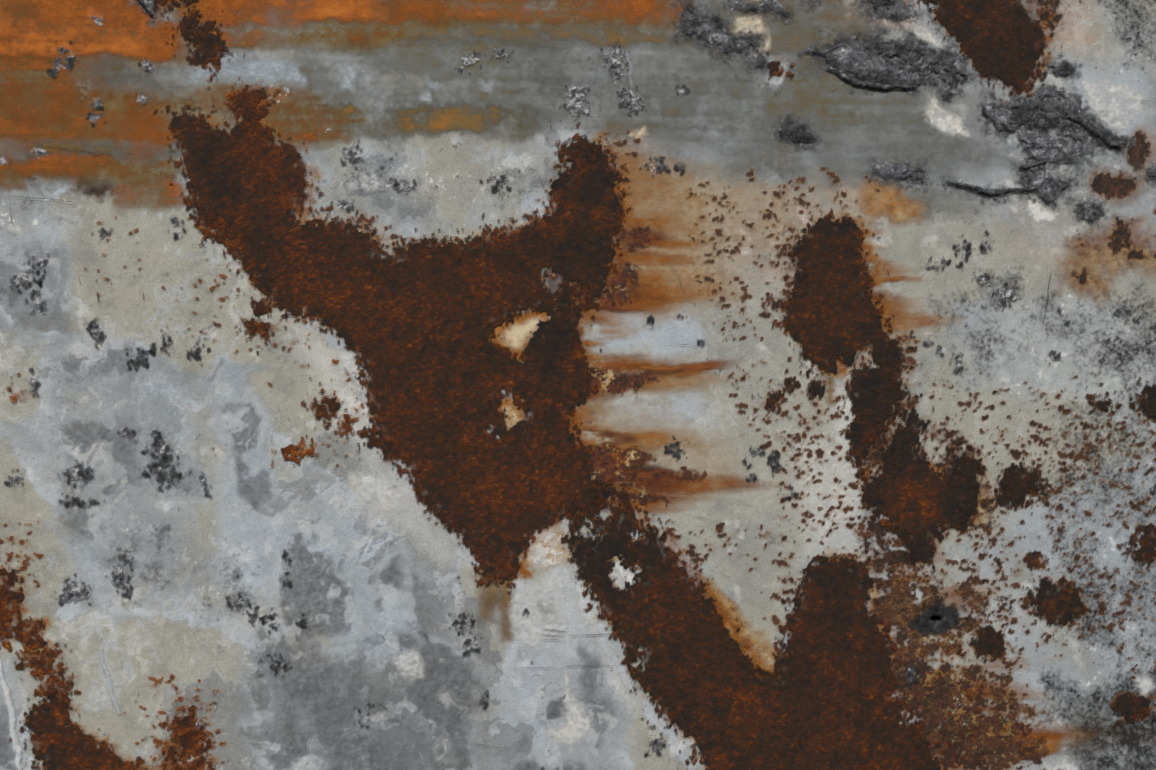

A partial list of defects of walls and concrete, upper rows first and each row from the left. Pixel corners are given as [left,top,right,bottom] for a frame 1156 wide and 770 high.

corrosion [917,0,1062,107]
corrosion [773,177,806,198]
corrosion [759,202,780,228]
corrosion [701,228,745,263]
corrosion [1066,217,1156,288]
corrosion [721,276,763,340]
corrosion [958,392,1006,420]
corrosion [271,434,337,465]
corrosion [776,404,828,484]
corrosion [716,523,738,555]
corrosion [1120,580,1148,606]
corrosion [0,521,226,770]